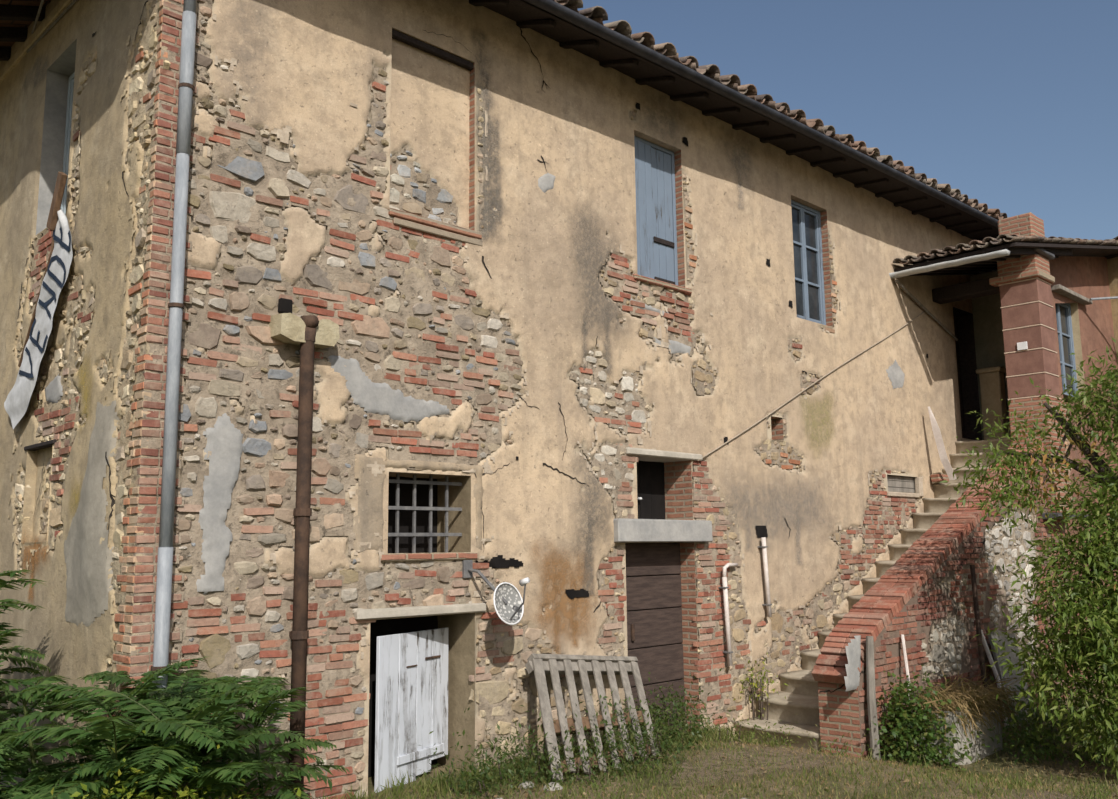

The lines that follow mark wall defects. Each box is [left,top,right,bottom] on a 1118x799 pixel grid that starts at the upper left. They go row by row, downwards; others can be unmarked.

crack [519,27,549,88]
spalling [66,102,92,257]
spalling [12,229,53,364]
spalling [8,271,95,580]
crack [105,452,130,529]
spalling [96,0,606,799]
spalling [570,174,718,519]
spalling [754,413,806,473]
spalling [687,460,949,728]